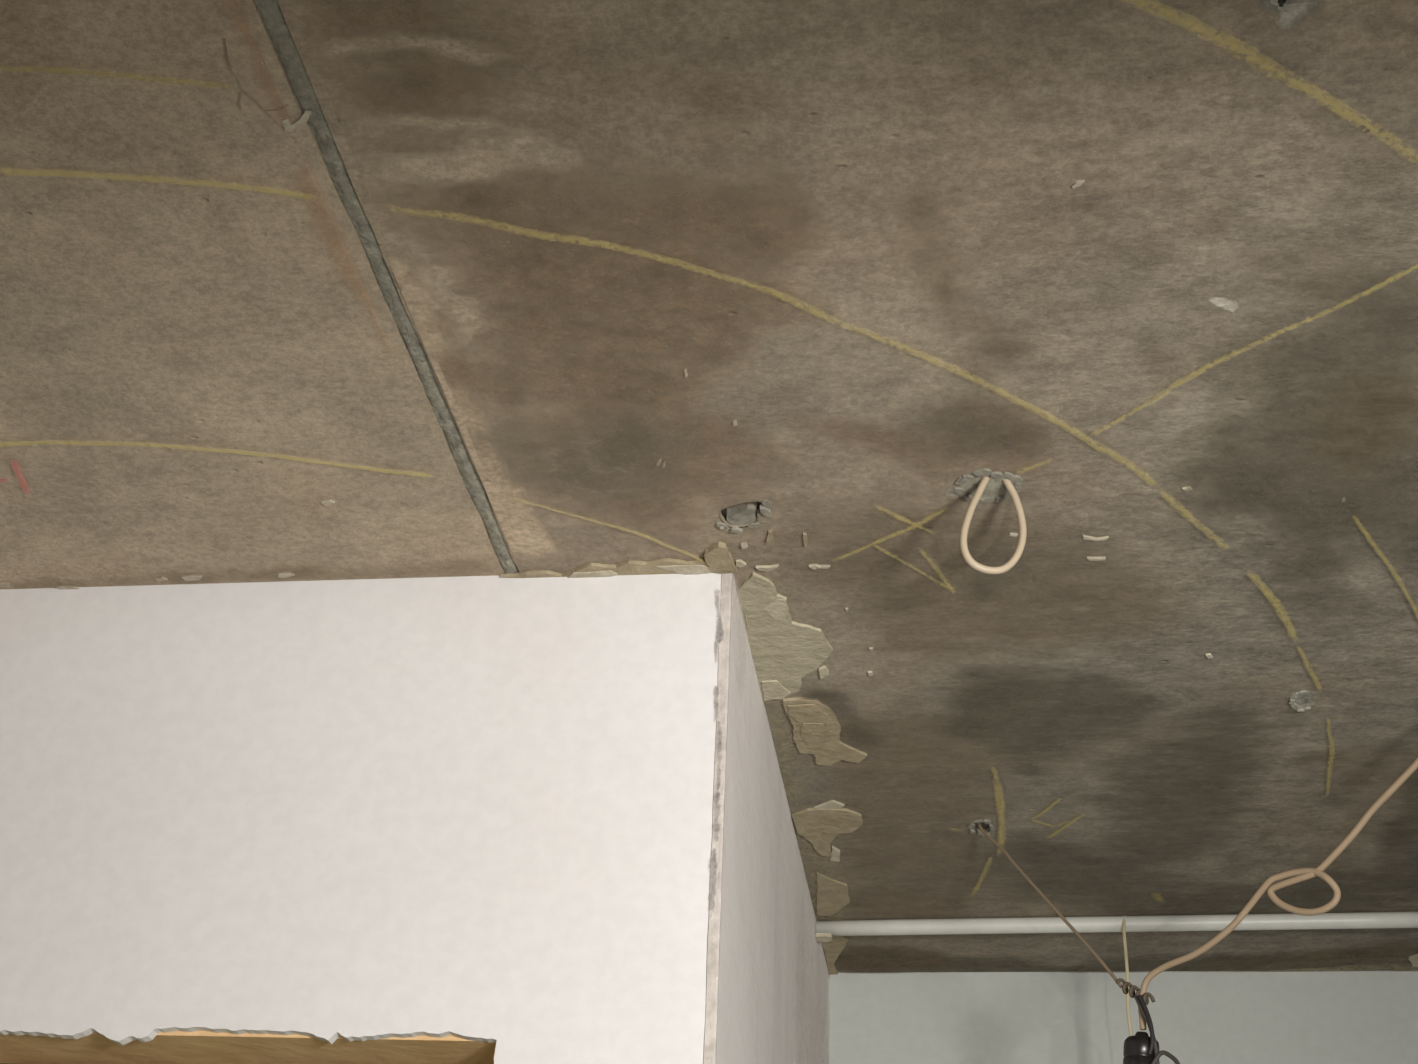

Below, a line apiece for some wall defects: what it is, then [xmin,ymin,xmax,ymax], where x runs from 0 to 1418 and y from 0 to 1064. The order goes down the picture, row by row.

damp [318,0,811,522]
damp [1192,301,1418,601]
damp [825,515,1143,650]
peeling [710,791,721,910]
flaking render [792,800,863,916]
flaking render [821,936,849,975]
damp [807,670,1157,919]
damp [1003,712,1418,915]